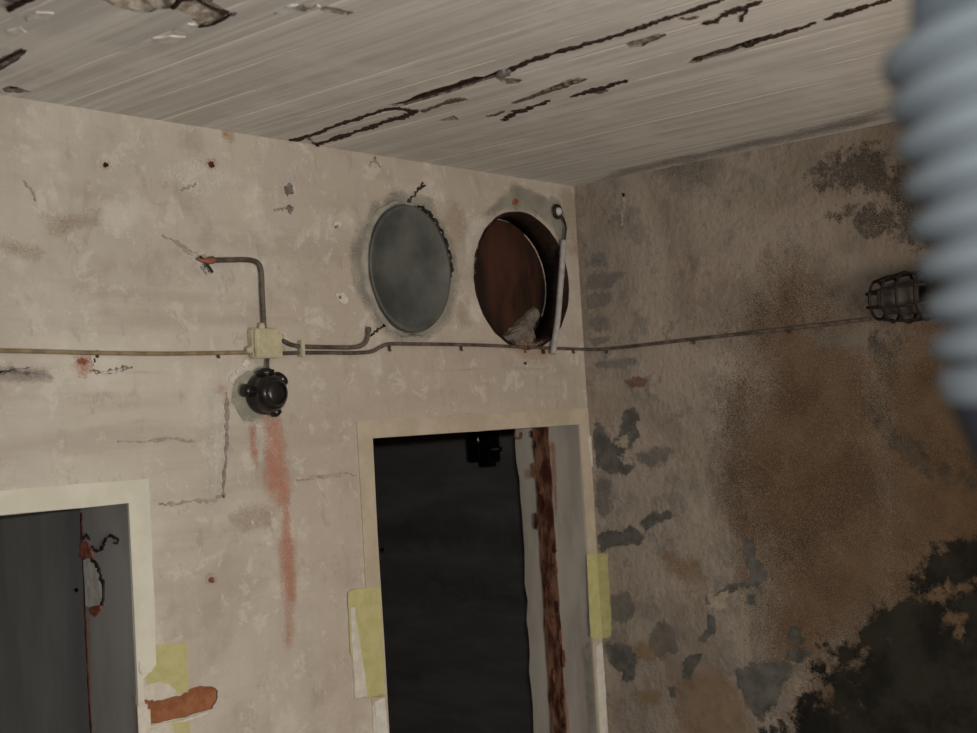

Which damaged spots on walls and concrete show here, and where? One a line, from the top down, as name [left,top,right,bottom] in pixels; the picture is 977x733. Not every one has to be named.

spalling [110,0,236,44]
crack [289,0,892,147]
crack [117,387,230,507]
corrosion [248,415,299,651]
crack [297,471,357,481]
corrosion [524,427,569,733]
peeling [596,640,637,733]
peeling [610,590,637,624]
peeling [588,406,674,553]
peeling [682,536,768,680]
peeling [734,626,814,723]
damp [630,234,977,733]